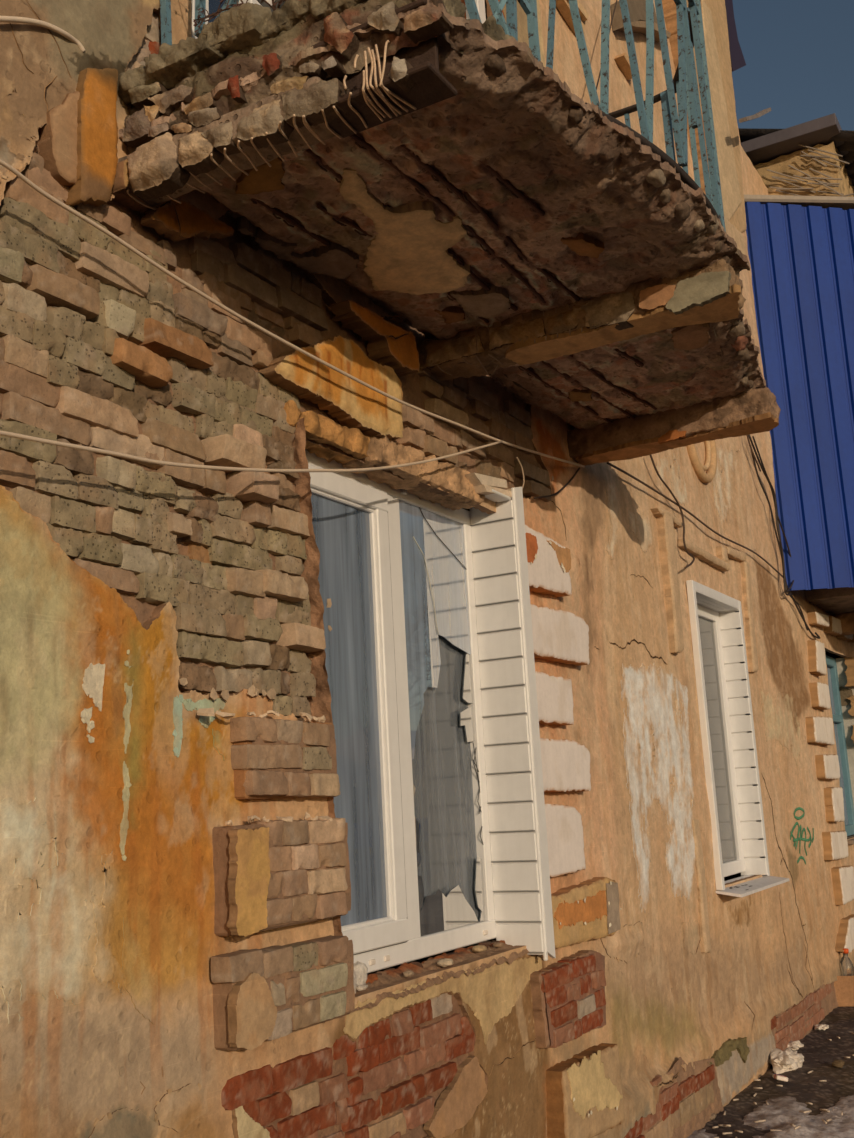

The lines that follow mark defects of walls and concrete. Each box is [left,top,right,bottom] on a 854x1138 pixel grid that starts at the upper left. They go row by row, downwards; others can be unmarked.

crack [10,0,72,121]
spalling [646,169,740,276]
flaking render [0,0,580,798]
spalling [518,354,657,424]
spalling [728,319,754,389]
leakage [0,487,103,805]
crack [594,639,666,664]
leakage [115,614,151,836]
crack [761,773,814,998]
flaking render [211,935,606,1138]
flaking render [624,1057,724,1138]